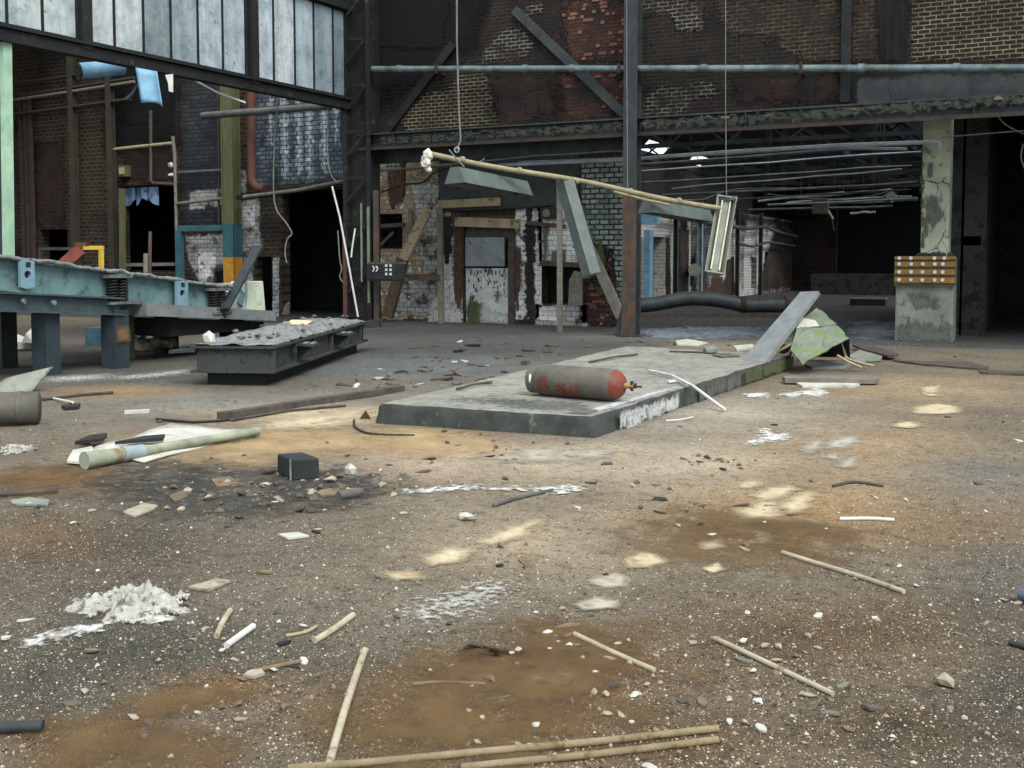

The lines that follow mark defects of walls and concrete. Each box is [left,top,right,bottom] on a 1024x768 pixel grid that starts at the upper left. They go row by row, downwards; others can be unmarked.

spalling [380,0,624,144]
peeling [186,234,223,283]
peeling [241,198,261,281]
peeling [380,161,479,320]
peeling [515,158,623,326]